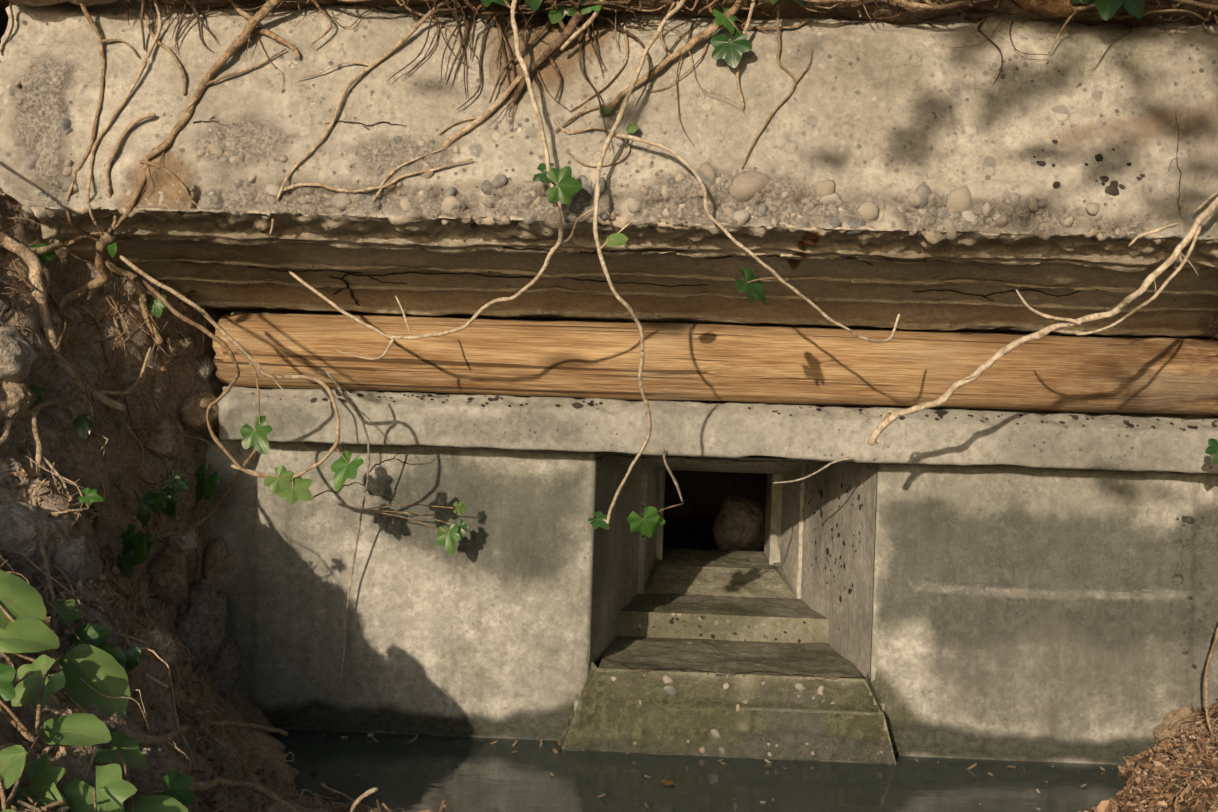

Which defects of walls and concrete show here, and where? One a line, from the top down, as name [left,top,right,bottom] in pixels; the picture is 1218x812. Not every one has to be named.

crack [248,246,1099,306]
corrosion [787,231,819,270]
damp [378,456,576,576]
damp [250,499,1218,766]